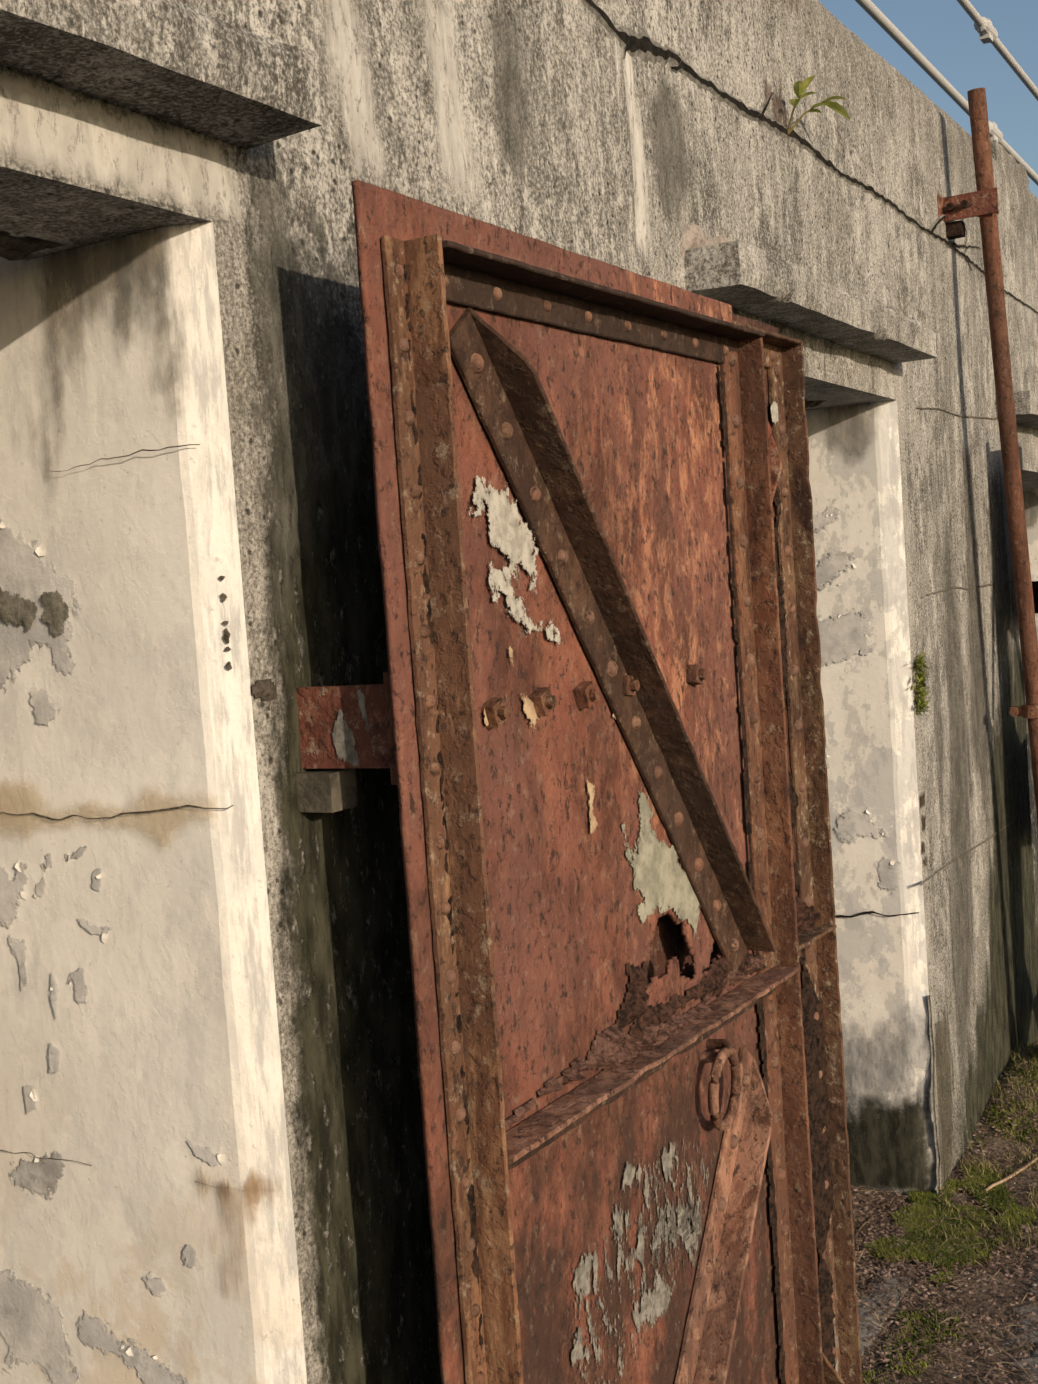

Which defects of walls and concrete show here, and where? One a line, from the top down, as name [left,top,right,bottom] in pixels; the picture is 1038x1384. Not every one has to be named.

efflorescence [326,0,383,174]
efflorescence [426,0,474,197]
crack [580,0,1038,315]
peeling [0,519,83,694]
peeling [813,496,858,591]
peeling [817,607,876,666]
peeling [0,846,87,991]
crack [0,805,234,820]
leakage [0,74,442,1384]
crack [835,824,1009,918]
leakage [843,452,1038,1193]
peeling [0,1269,189,1384]